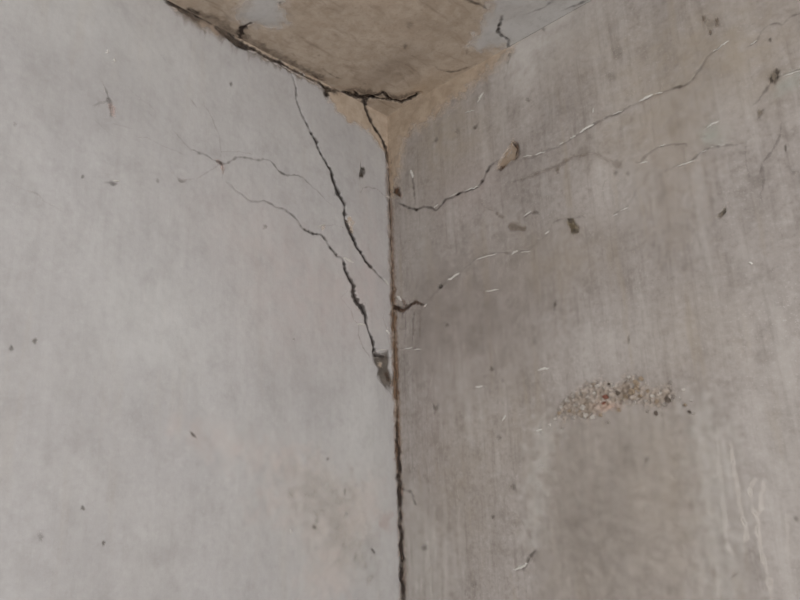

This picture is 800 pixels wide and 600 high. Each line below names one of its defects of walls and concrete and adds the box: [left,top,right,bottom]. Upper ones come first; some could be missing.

flaking render [168,0,506,191]
crack [523,124,594,157]
crack [166,0,489,600]
spalling [374,353,392,387]
spalling [536,375,695,432]